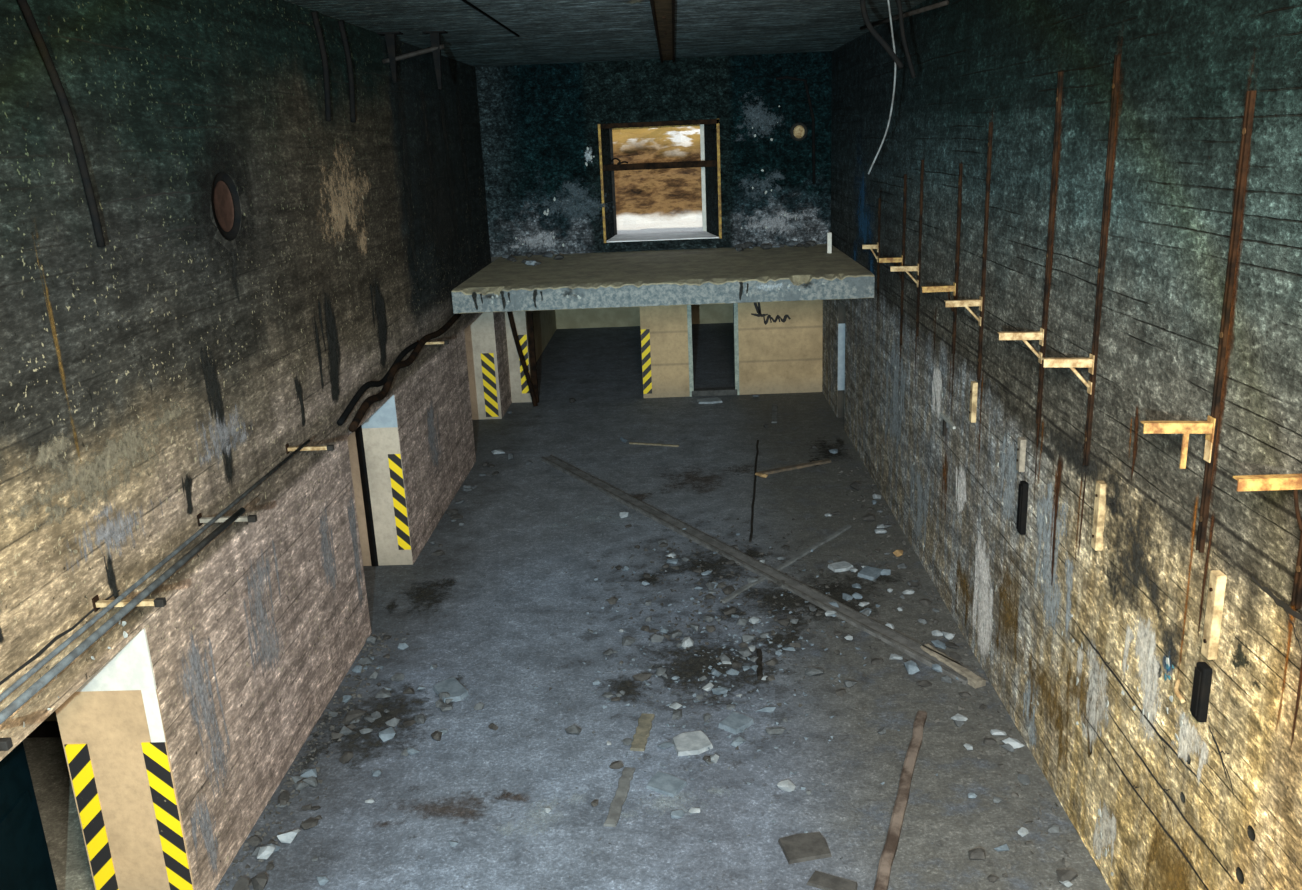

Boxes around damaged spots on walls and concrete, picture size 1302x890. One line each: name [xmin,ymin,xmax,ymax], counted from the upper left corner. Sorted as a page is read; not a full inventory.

rust [1075,474,1086,560]
rust [1178,148,1251,671]